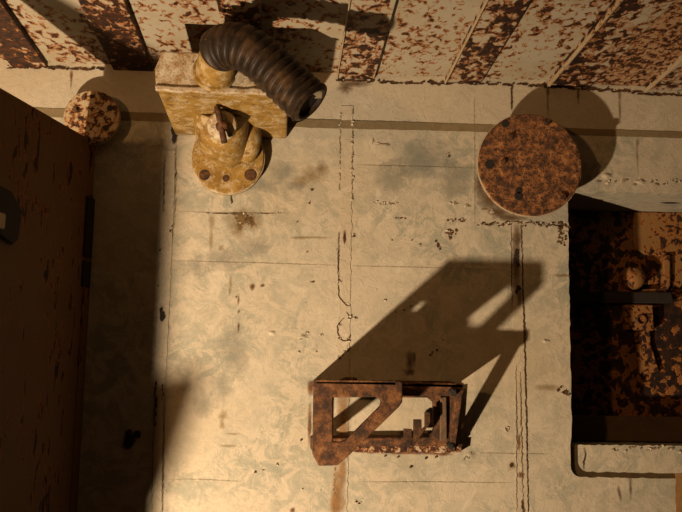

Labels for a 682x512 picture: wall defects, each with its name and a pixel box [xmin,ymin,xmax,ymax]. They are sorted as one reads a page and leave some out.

corrosion [213,212,255,230]
crack [330,232,353,360]
crack [498,226,529,511]
corrosion [331,463,344,512]